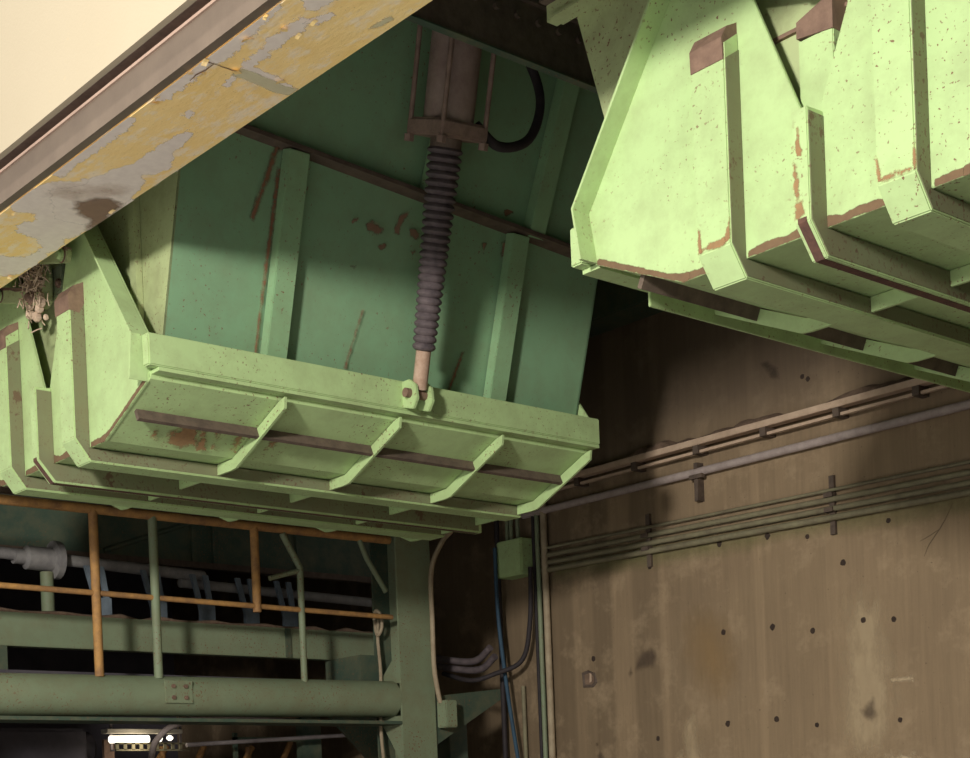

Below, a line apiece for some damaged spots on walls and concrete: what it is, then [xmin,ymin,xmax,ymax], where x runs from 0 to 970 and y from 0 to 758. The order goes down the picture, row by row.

peeling [0,117,193,279]
damp [74,198,121,228]
rust [748,128,970,313]
rust [697,222,730,254]
rust [597,259,706,282]
rust [152,427,220,451]